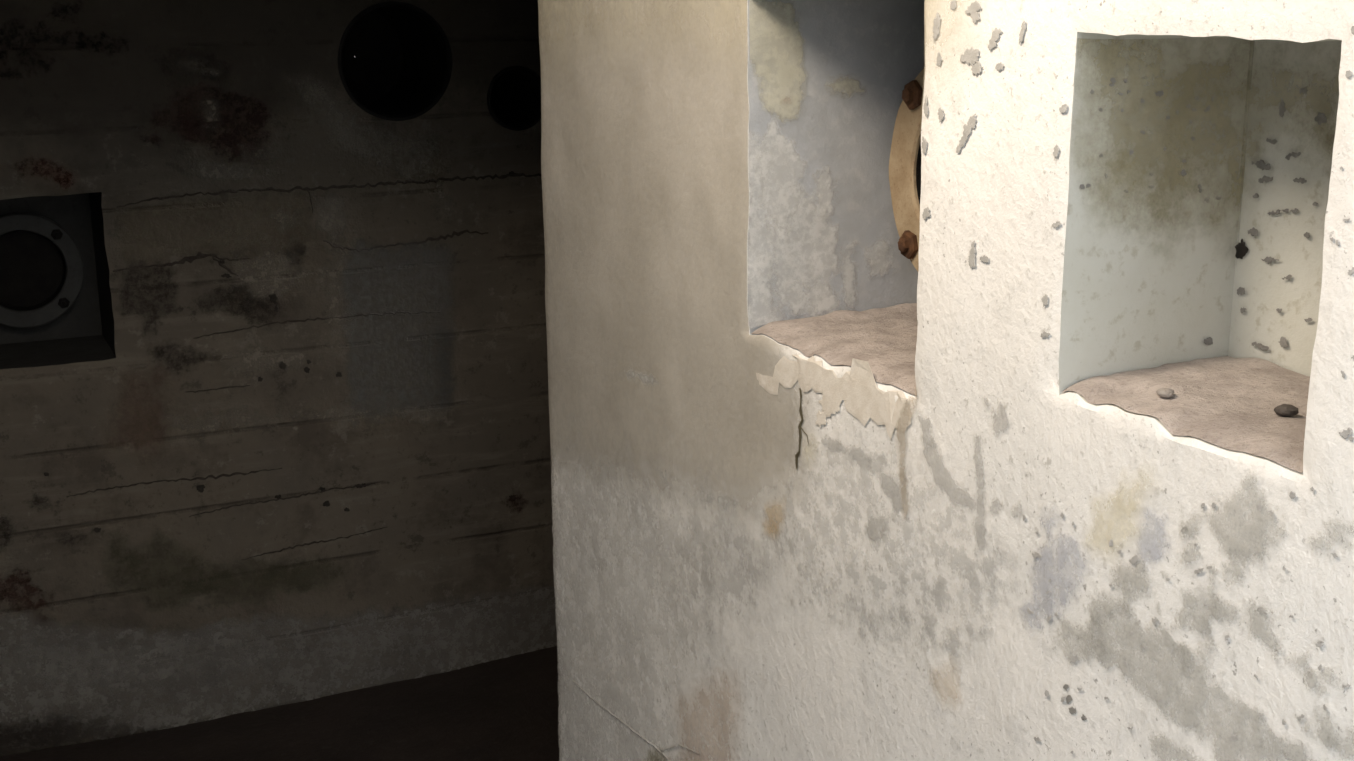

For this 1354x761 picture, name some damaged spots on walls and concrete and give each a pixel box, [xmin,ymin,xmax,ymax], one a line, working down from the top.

leakage [1080,38,1339,206]
spalling [1251,138,1301,198]
spalling [1267,202,1318,215]
spalling [1235,227,1258,259]
peeling [539,0,1004,632]
spalling [1252,337,1288,350]
peeling [984,399,1008,432]
peeling [1339,427,1354,441]
peeling [1027,477,1354,761]